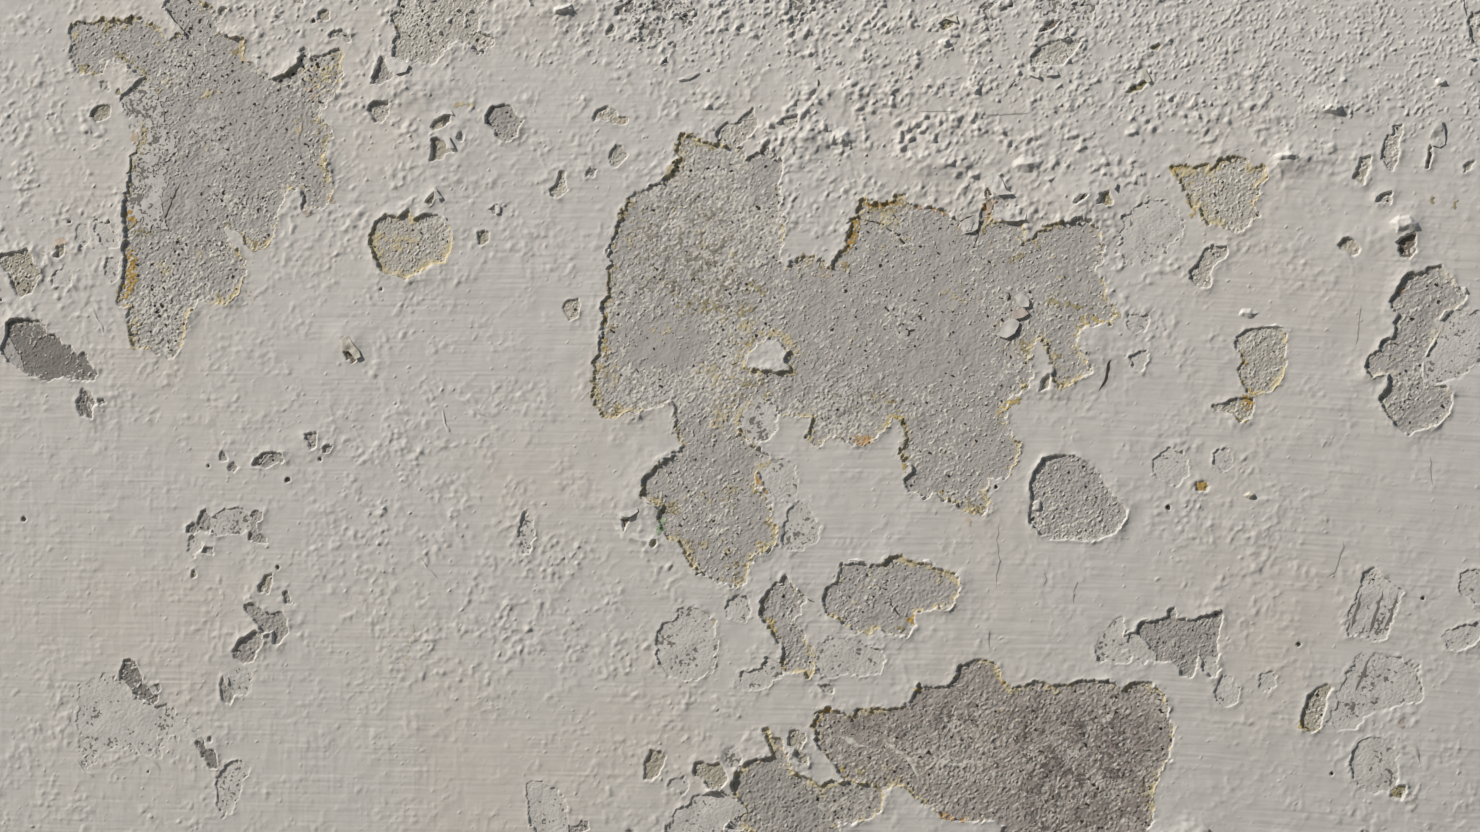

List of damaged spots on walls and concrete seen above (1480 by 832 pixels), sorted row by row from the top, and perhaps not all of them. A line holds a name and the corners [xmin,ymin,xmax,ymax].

peeling [70,0,351,358]
peeling [371,195,452,291]
peeling [1173,157,1264,287]
peeling [2,319,105,419]
peeling [587,107,1126,587]
peeling [1212,328,1287,422]
peeling [1366,234,1466,435]
peeling [188,510,213,554]
peeling [249,511,267,543]
peeling [1137,608,1222,677]
peeling [693,556,1173,832]
peeling [645,751,666,780]